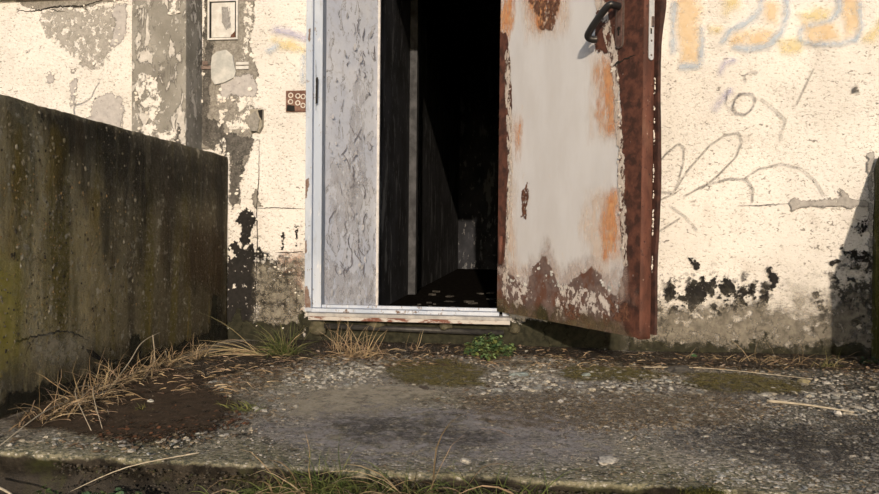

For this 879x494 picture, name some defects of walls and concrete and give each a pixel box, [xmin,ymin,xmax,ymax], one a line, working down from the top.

corrosion [501,0,514,35]
peeling [14,0,127,106]
peeling [82,93,126,128]
peeling [134,73,180,142]
corrosion [596,65,615,132]
flaking render [201,0,311,329]
corrosion [602,191,617,260]
corrosion [541,252,630,322]
leakage [0,252,872,418]